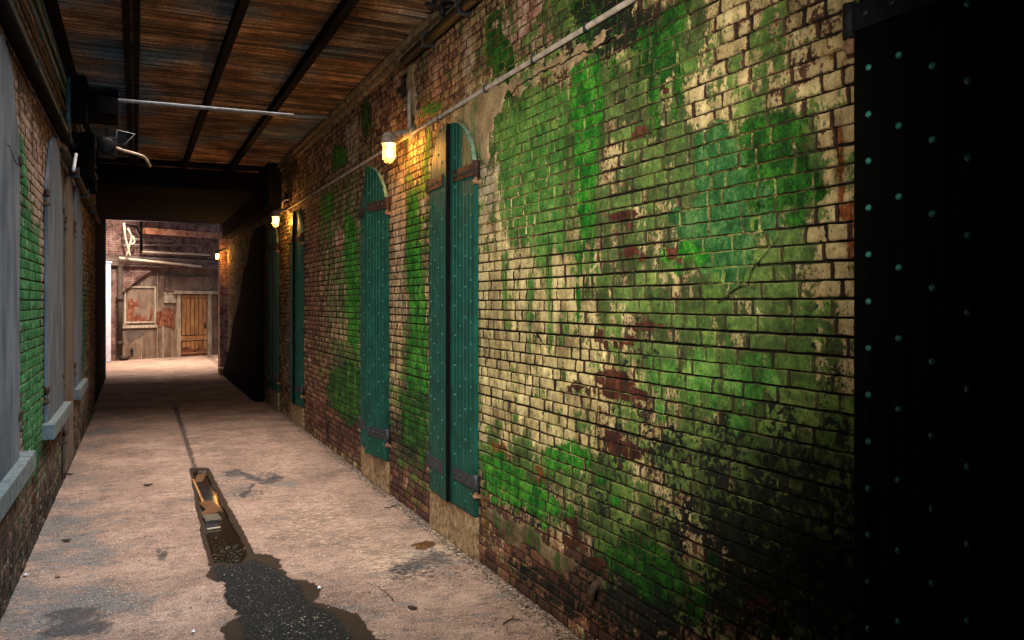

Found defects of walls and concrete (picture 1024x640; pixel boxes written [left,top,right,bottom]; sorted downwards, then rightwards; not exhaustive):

leakage [575,0,685,142]
leakage [390,171,428,322]
leakage [501,251,509,315]
leakage [526,264,553,353]
leakage [574,210,595,322]
rust [836,127,854,272]
leakage [497,552,613,633]